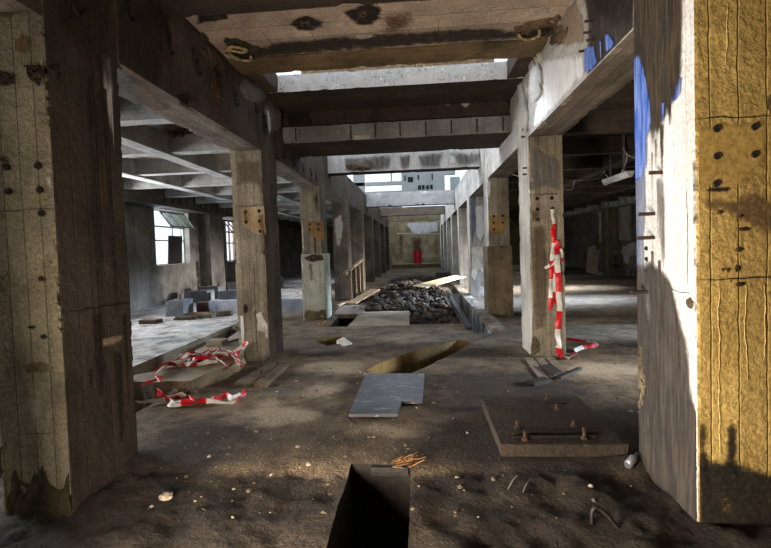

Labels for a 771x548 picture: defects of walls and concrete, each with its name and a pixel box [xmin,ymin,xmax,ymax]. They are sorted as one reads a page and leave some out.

damp [292,16,321,31]
damp [345,4,411,31]
spalling [0,71,15,86]
spalling [24,65,45,86]
spalling [7,465,71,516]